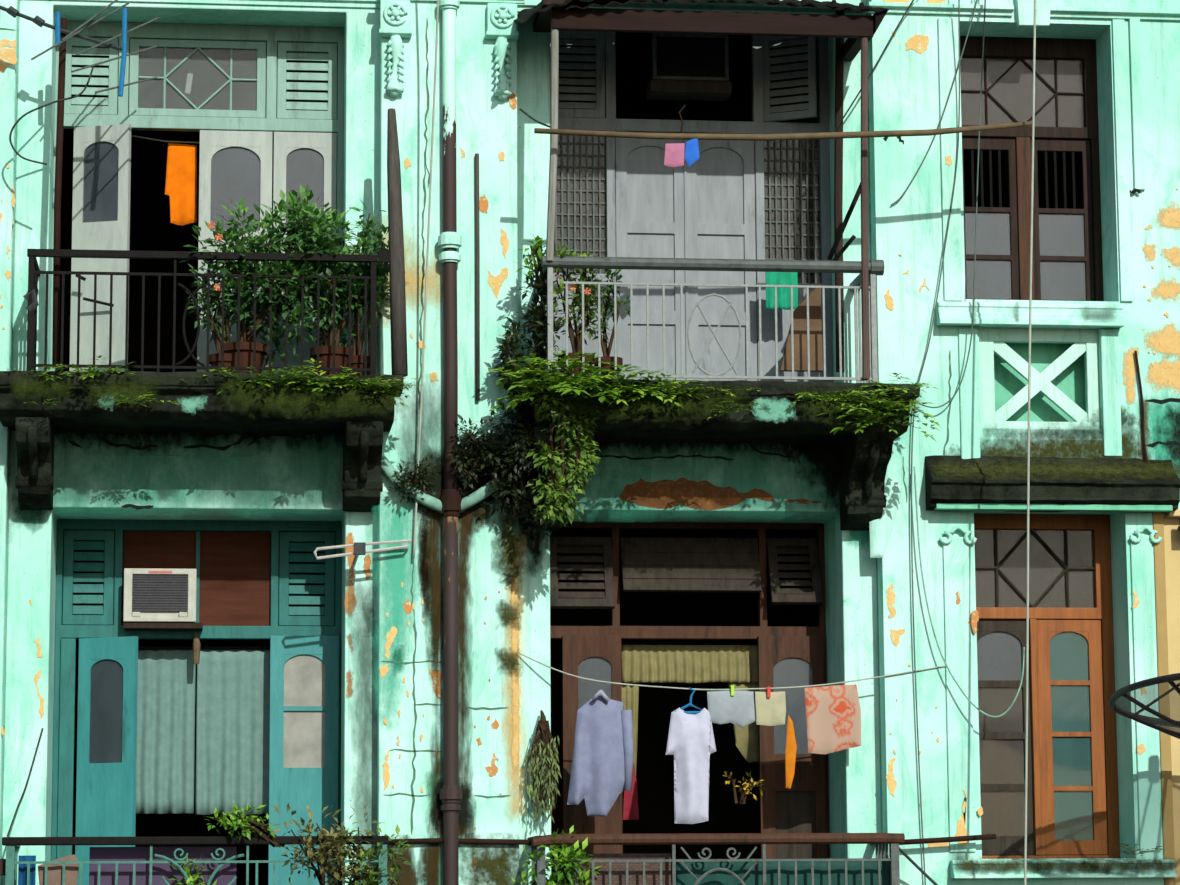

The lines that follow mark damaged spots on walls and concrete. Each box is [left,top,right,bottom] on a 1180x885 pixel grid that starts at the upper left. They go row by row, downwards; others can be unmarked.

peeling [0,39,17,72]
peeling [892,32,929,54]
peeling [1145,188,1180,230]
peeling [1143,244,1180,268]
peeling [1123,281,1180,404]
flaking render [620,477,821,510]
damp [407,452,444,672]
damp [357,600,376,769]
damp [458,451,523,885]
damp [362,785,374,850]
damp [387,732,443,885]